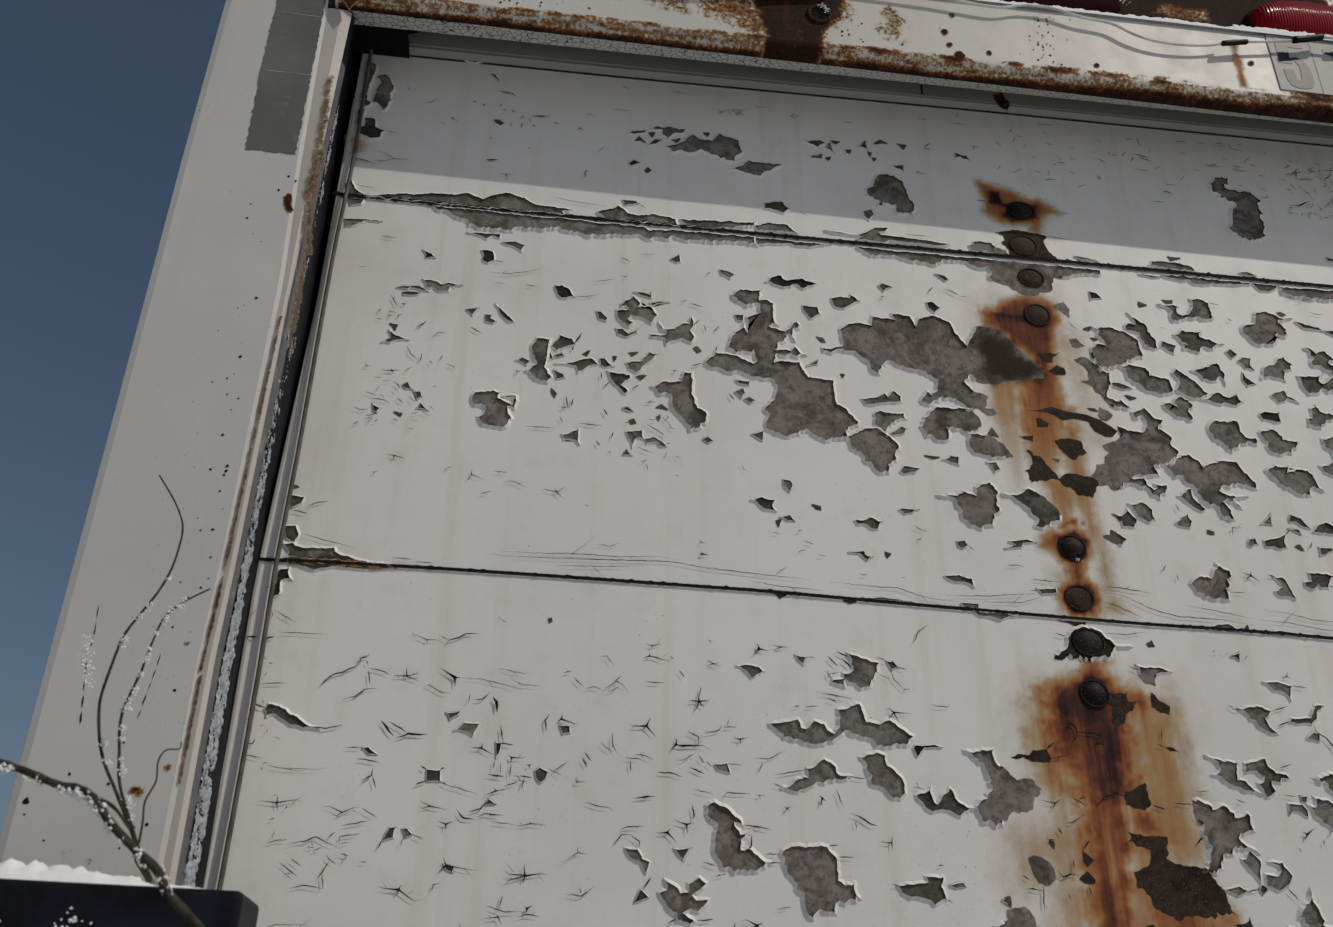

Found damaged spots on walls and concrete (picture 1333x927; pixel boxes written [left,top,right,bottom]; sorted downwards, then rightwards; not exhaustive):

corrosion [338,0,1333,124]
peeling [343,140,1102,318]
corrosion [975,180,1060,234]
peeling [515,256,1333,550]
corrosion [978,294,1120,618]
peeling [1246,512,1333,601]
crack [246,594,893,927]
peeling [623,798,862,927]
peeling [766,652,1051,830]
corrosion [1018,659,1241,927]
peeling [1125,796,1294,927]
peeling [1202,754,1333,832]